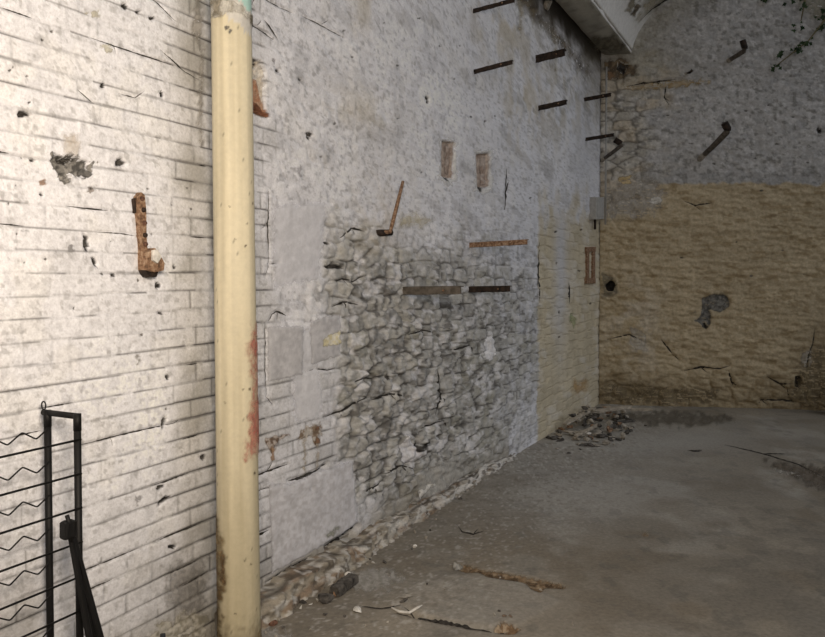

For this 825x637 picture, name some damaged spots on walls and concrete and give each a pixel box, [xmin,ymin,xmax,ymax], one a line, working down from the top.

peeling [210,0,253,27]
spalling [252,60,269,118]
spalling [50,137,98,185]
spalling [694,294,730,329]
crack [662,341,737,388]
crack [759,377,794,405]
rust [265,434,288,461]
rust [299,425,322,469]
leakage [351,568,405,592]